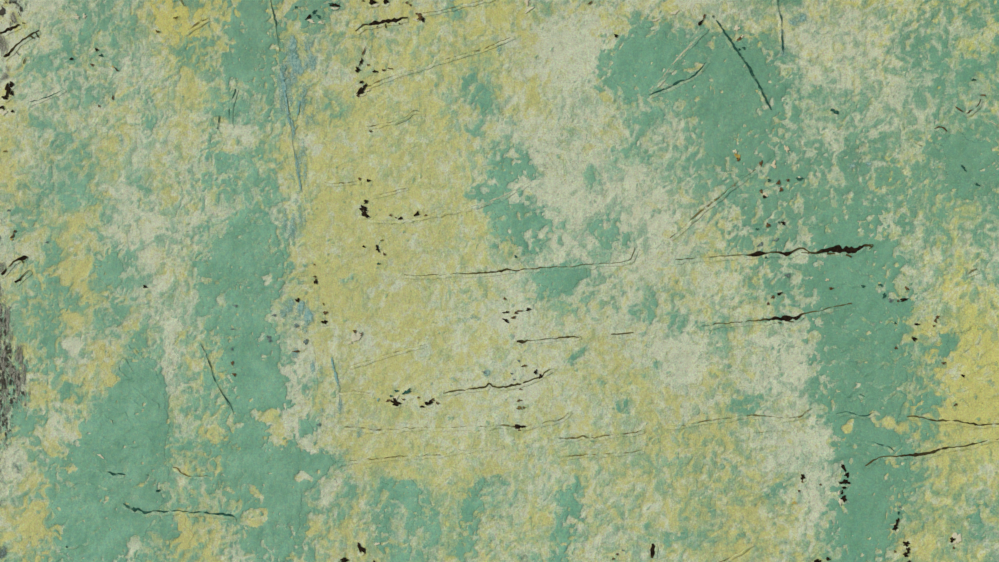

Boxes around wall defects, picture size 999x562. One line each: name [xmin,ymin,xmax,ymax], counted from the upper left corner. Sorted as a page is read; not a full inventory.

crack [649,60,711,99]
crack [404,247,639,279]
crack [675,244,873,265]
crack [702,303,852,330]
crack [517,336,581,345]
crack [443,368,555,396]
crack [344,394,999,469]
crack [102,471,149,479]
crack [121,503,236,522]